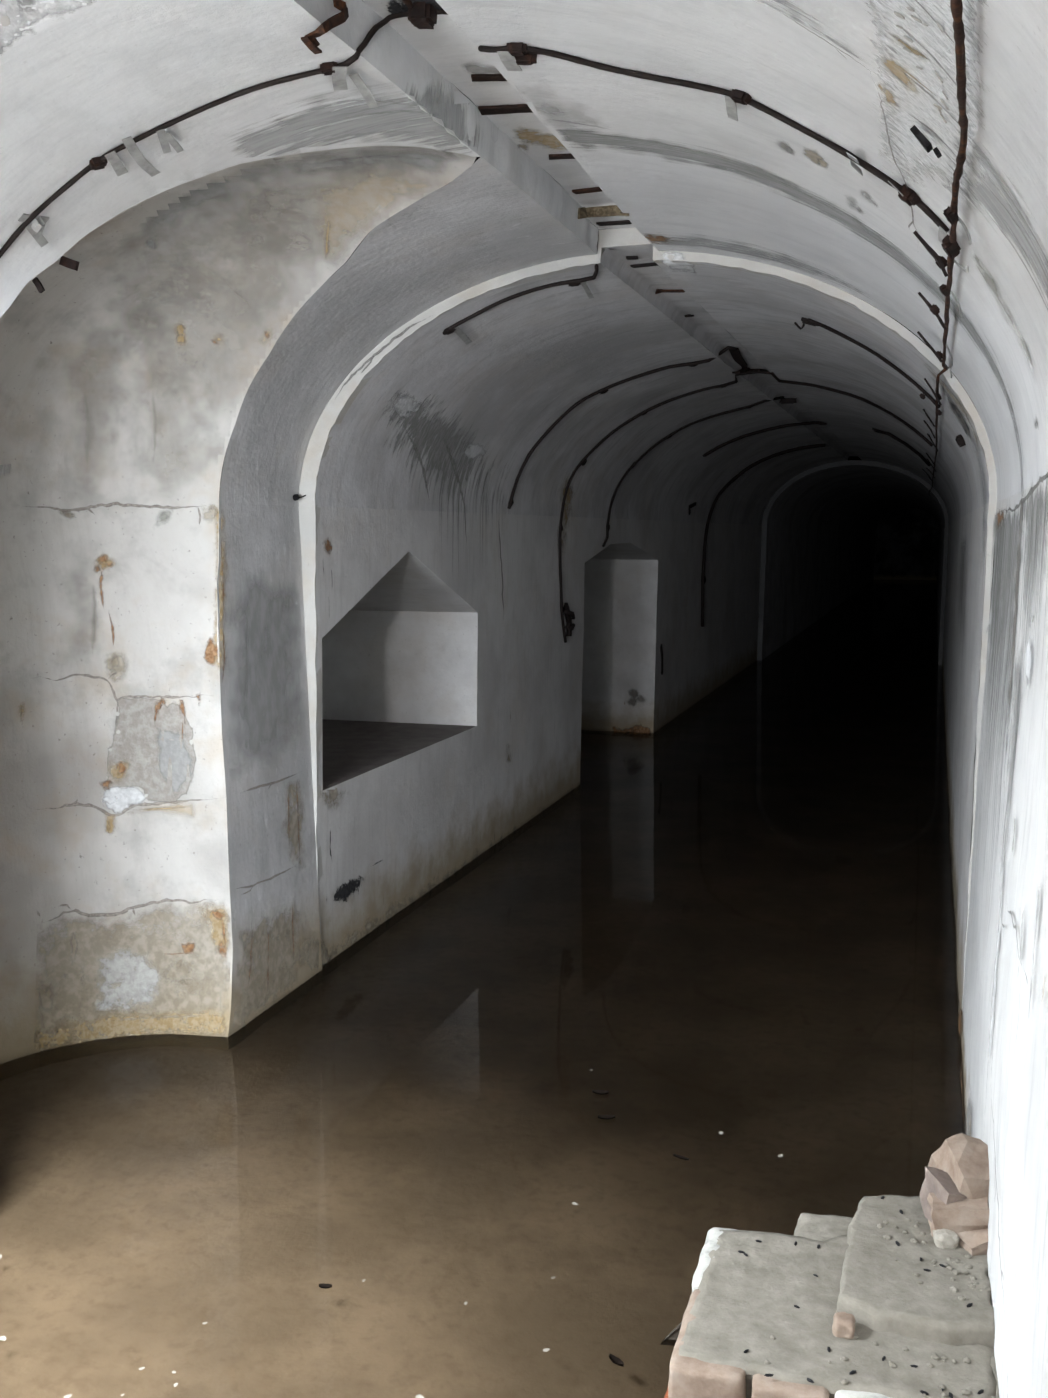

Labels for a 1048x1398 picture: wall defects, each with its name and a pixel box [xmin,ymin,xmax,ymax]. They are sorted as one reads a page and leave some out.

leakage [156,182,225,222]
leakage [239,90,470,253]
crack [773,8,916,229]
leakage [386,395,499,532]
leakage [517,107,1048,910]
crack [1002,473,1048,520]
spalling [107,698,196,802]
crack [986,819,1027,1288]